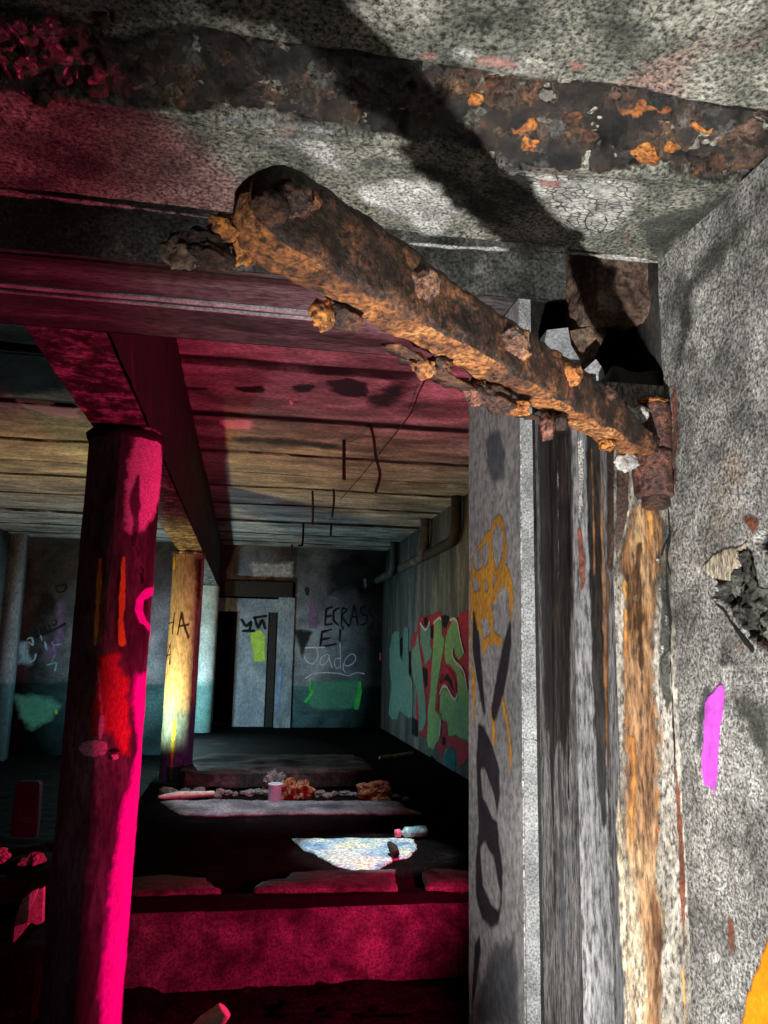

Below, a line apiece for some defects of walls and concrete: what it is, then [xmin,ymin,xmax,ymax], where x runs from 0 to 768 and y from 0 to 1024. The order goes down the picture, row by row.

crack [566,213,613,233]
water stain [538,427,572,981]
water stain [586,435,645,1024]
rust [621,504,665,1024]
spalling [703,542,768,653]